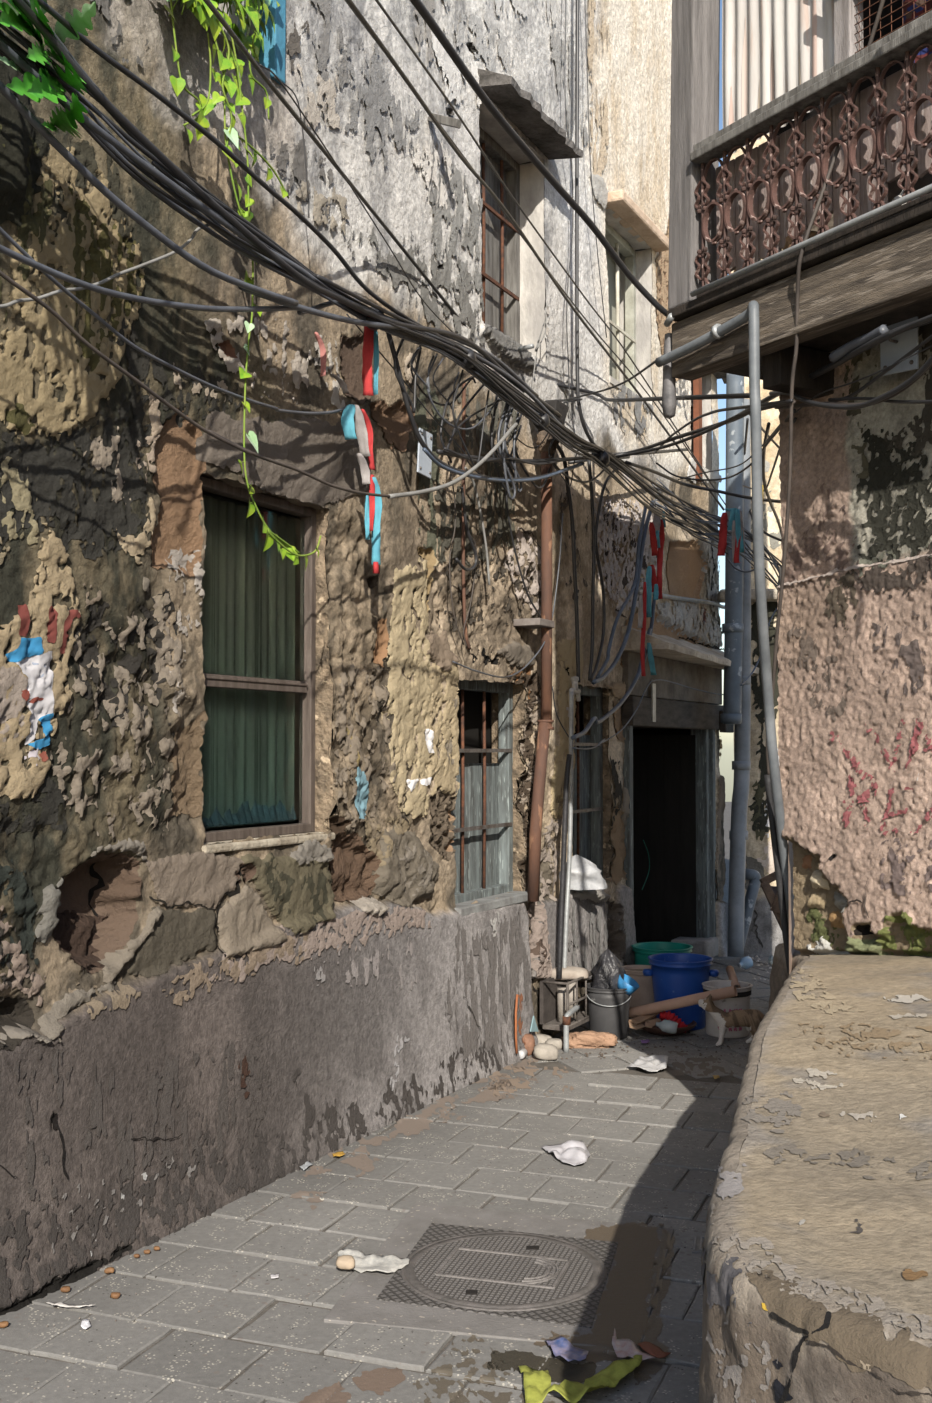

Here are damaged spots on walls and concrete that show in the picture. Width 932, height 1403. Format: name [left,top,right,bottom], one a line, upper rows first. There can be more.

peeling [289,180,350,236]
peeling [0,144,145,441]
peeling [404,353,417,383]
spalling [483,321,538,372]
spalling [559,492,657,602]
peeling [0,395,190,839]
peeling [162,527,541,1006]
peeling [496,638,584,979]
peeling [0,905,46,1051]
spalling [68,977,141,1019]
spalling [606,900,627,966]
spalling [757,836,932,956]